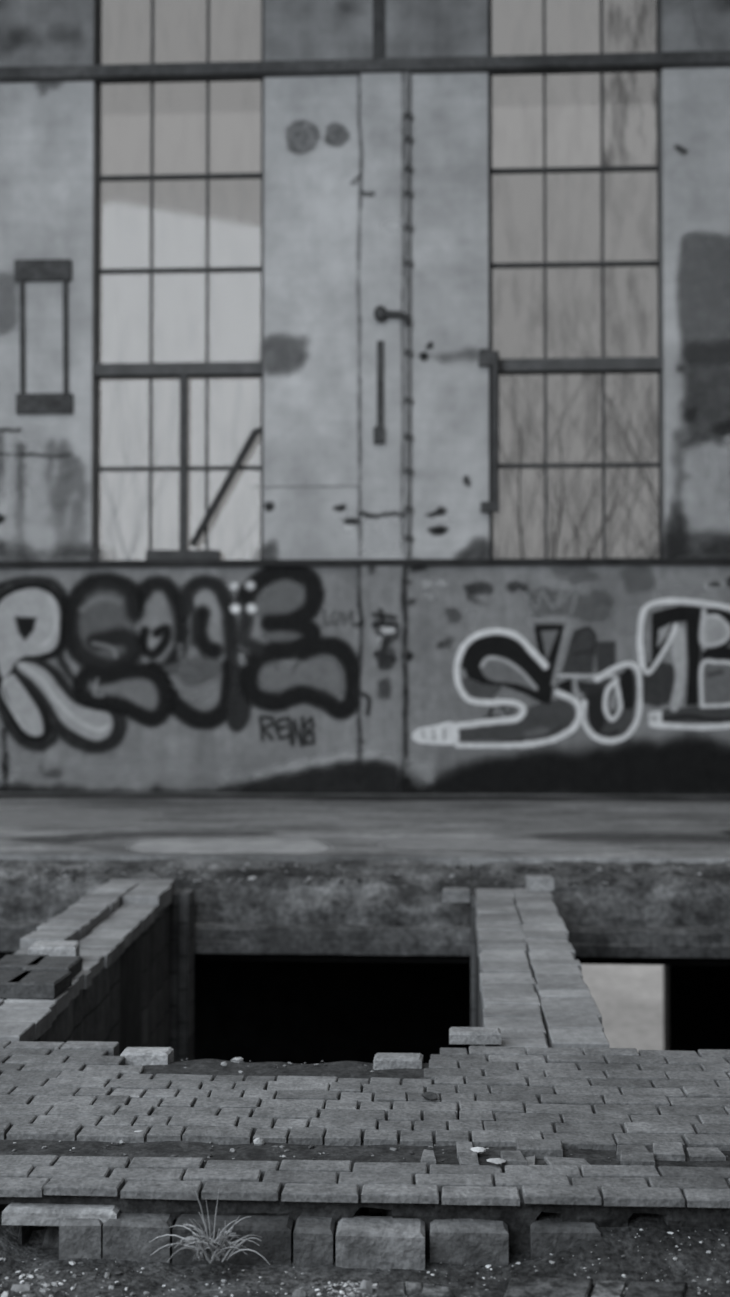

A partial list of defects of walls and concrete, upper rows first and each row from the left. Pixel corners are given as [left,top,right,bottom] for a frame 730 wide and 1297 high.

water stain [288,121,348,153]
water stain [0,275,15,333]
water stain [262,336,306,374]
peeling [678,233,730,444]